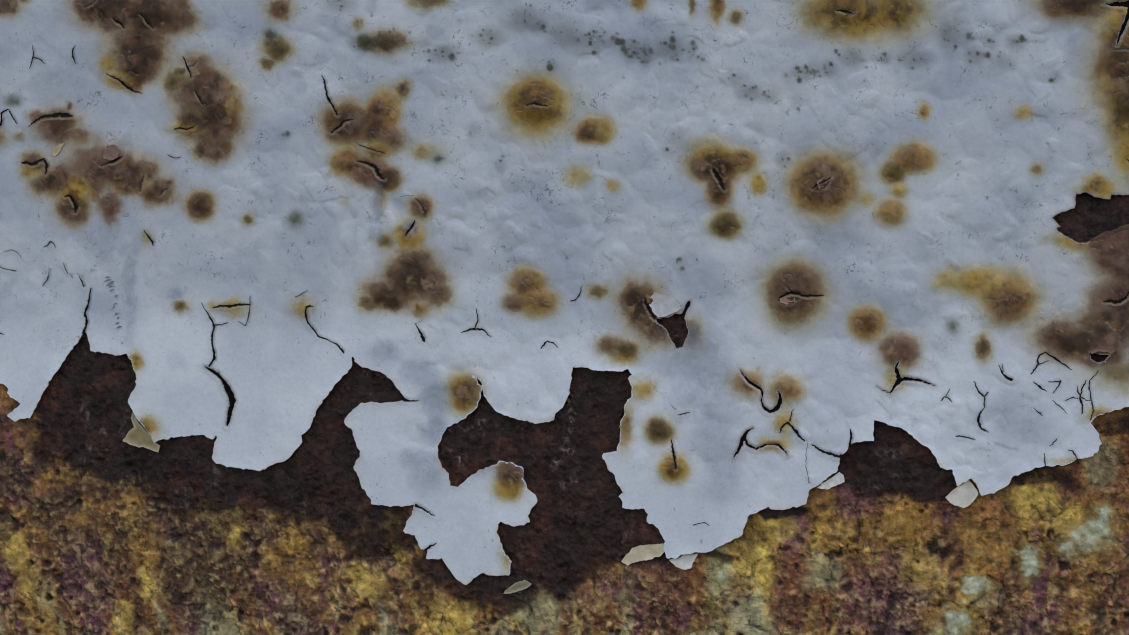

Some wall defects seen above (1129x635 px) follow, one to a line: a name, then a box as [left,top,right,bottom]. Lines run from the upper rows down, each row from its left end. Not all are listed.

corrosion [73,0,244,163]
crack [1107,0,1129,49]
corrosion [21,102,174,227]
peeling [37,336,408,560]
crack [201,296,251,426]
corrosion [358,195,453,316]
peeling [414,367,734,612]
crack [734,372,852,483]
peeling [817,420,978,508]
crack [882,352,1098,466]
corrosion [1034,230,1129,385]
peeling [1053,192,1129,243]